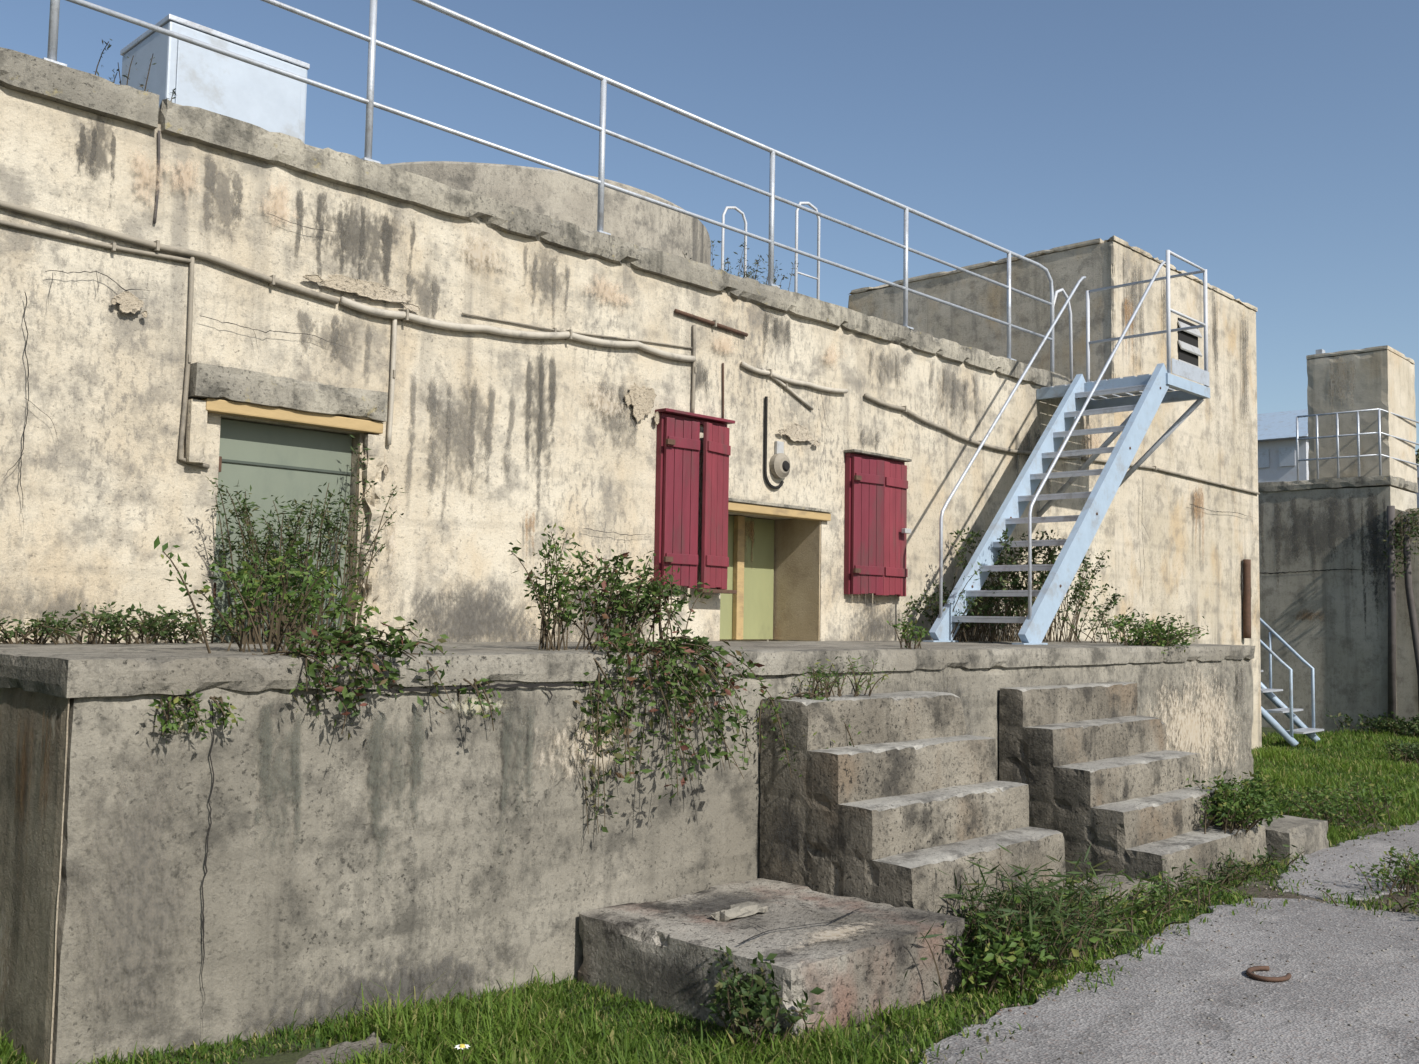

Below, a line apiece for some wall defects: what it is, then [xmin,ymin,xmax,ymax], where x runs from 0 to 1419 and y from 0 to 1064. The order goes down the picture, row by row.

water stain [77,119,116,196]
water stain [295,192,440,317]
crack [5,270,150,521]
water stain [407,358,556,518]
water stain [1259,494,1388,628]